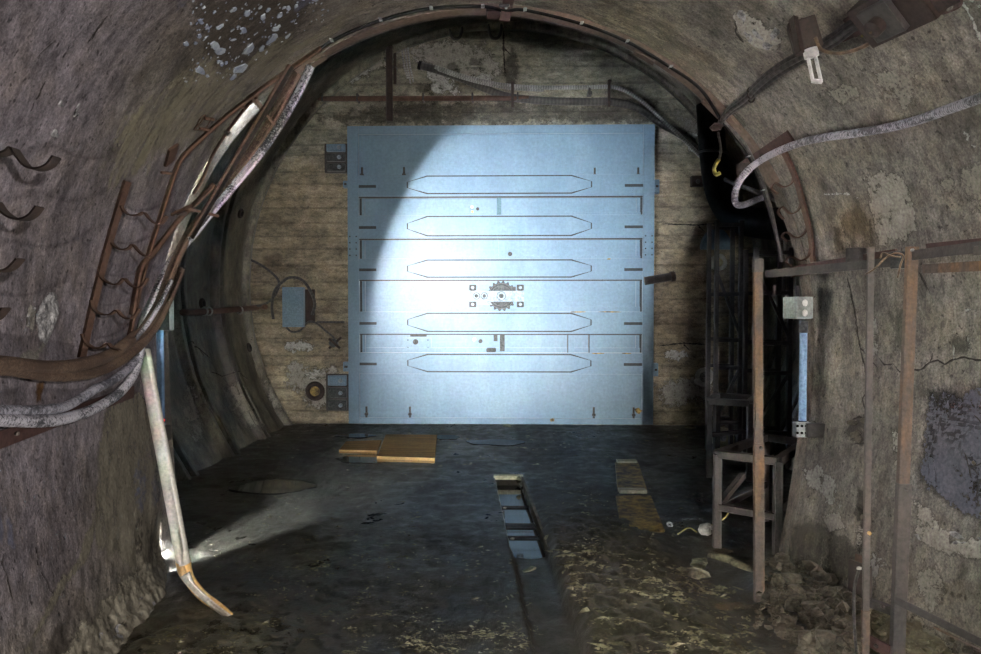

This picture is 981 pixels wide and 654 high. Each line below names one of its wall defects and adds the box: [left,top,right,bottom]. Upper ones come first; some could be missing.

peeling [183,0,329,83]
spalling [733,10,782,50]
crack [847,277,981,372]
water stain [927,389,978,483]